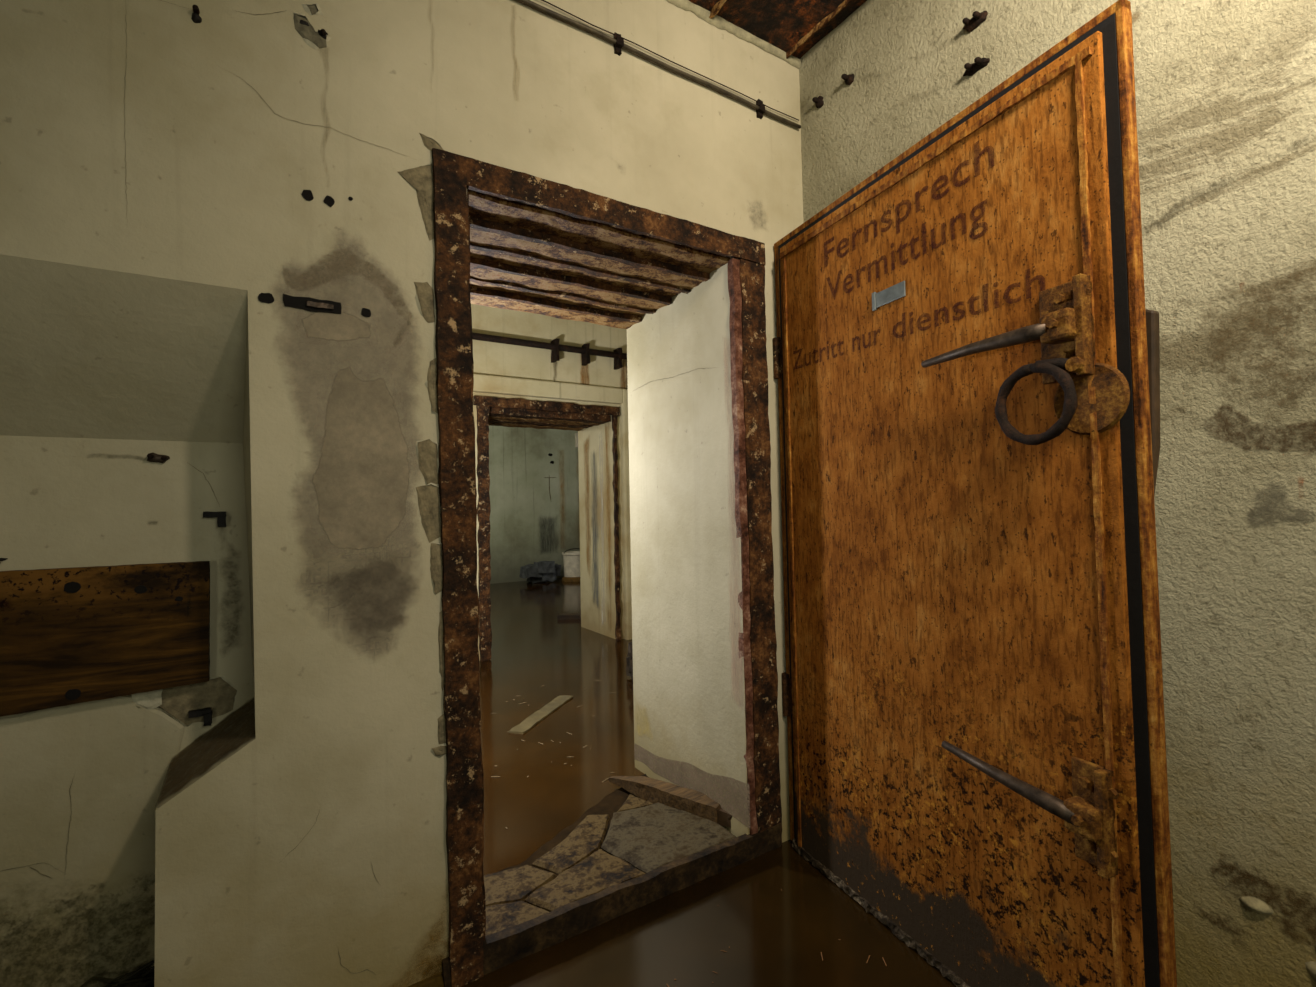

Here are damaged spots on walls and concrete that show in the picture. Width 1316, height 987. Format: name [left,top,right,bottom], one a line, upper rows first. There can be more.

spalling [293,3,331,50]
peeling [122,676,255,804]
leakage [1211,859,1316,945]